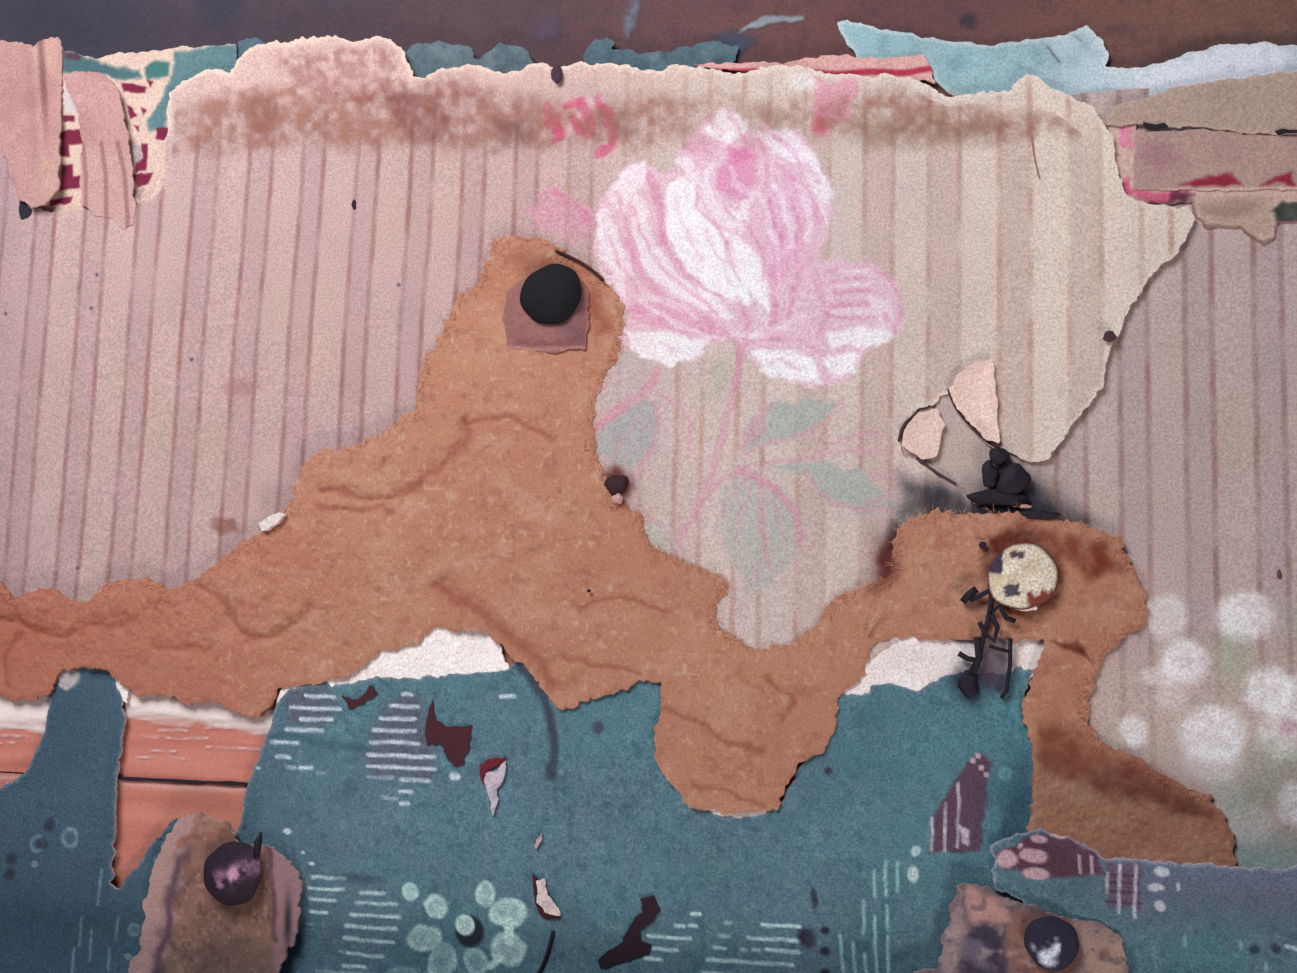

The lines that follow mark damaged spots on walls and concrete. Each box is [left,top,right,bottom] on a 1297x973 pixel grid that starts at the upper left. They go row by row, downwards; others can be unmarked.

peeling [0,37,137,230]
leakage [241,96,404,141]
peeling [949,358,1000,443]
peeling [901,408,945,460]
peeling [259,512,287,531]
peeling [0,695,50,744]
peeling [126,690,275,760]
peeling [484,761,506,815]